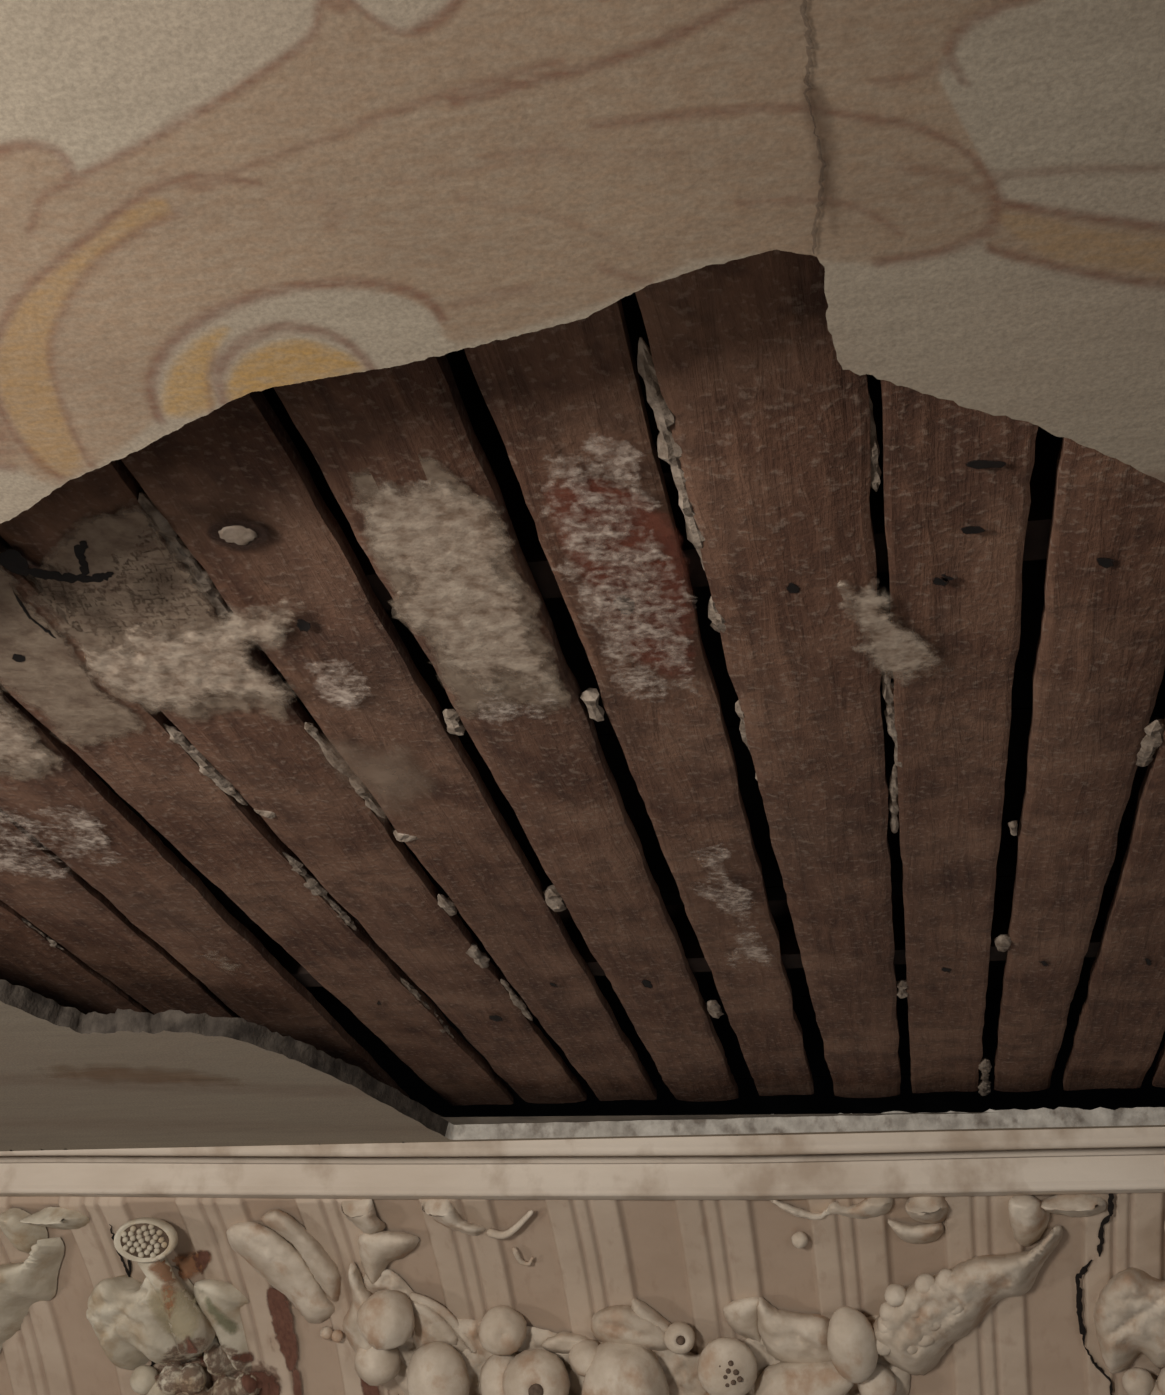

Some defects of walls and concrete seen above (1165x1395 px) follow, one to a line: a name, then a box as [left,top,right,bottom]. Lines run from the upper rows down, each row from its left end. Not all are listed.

spalling [0,979,1165,1140]
crack [1075,1193,1114,1395]